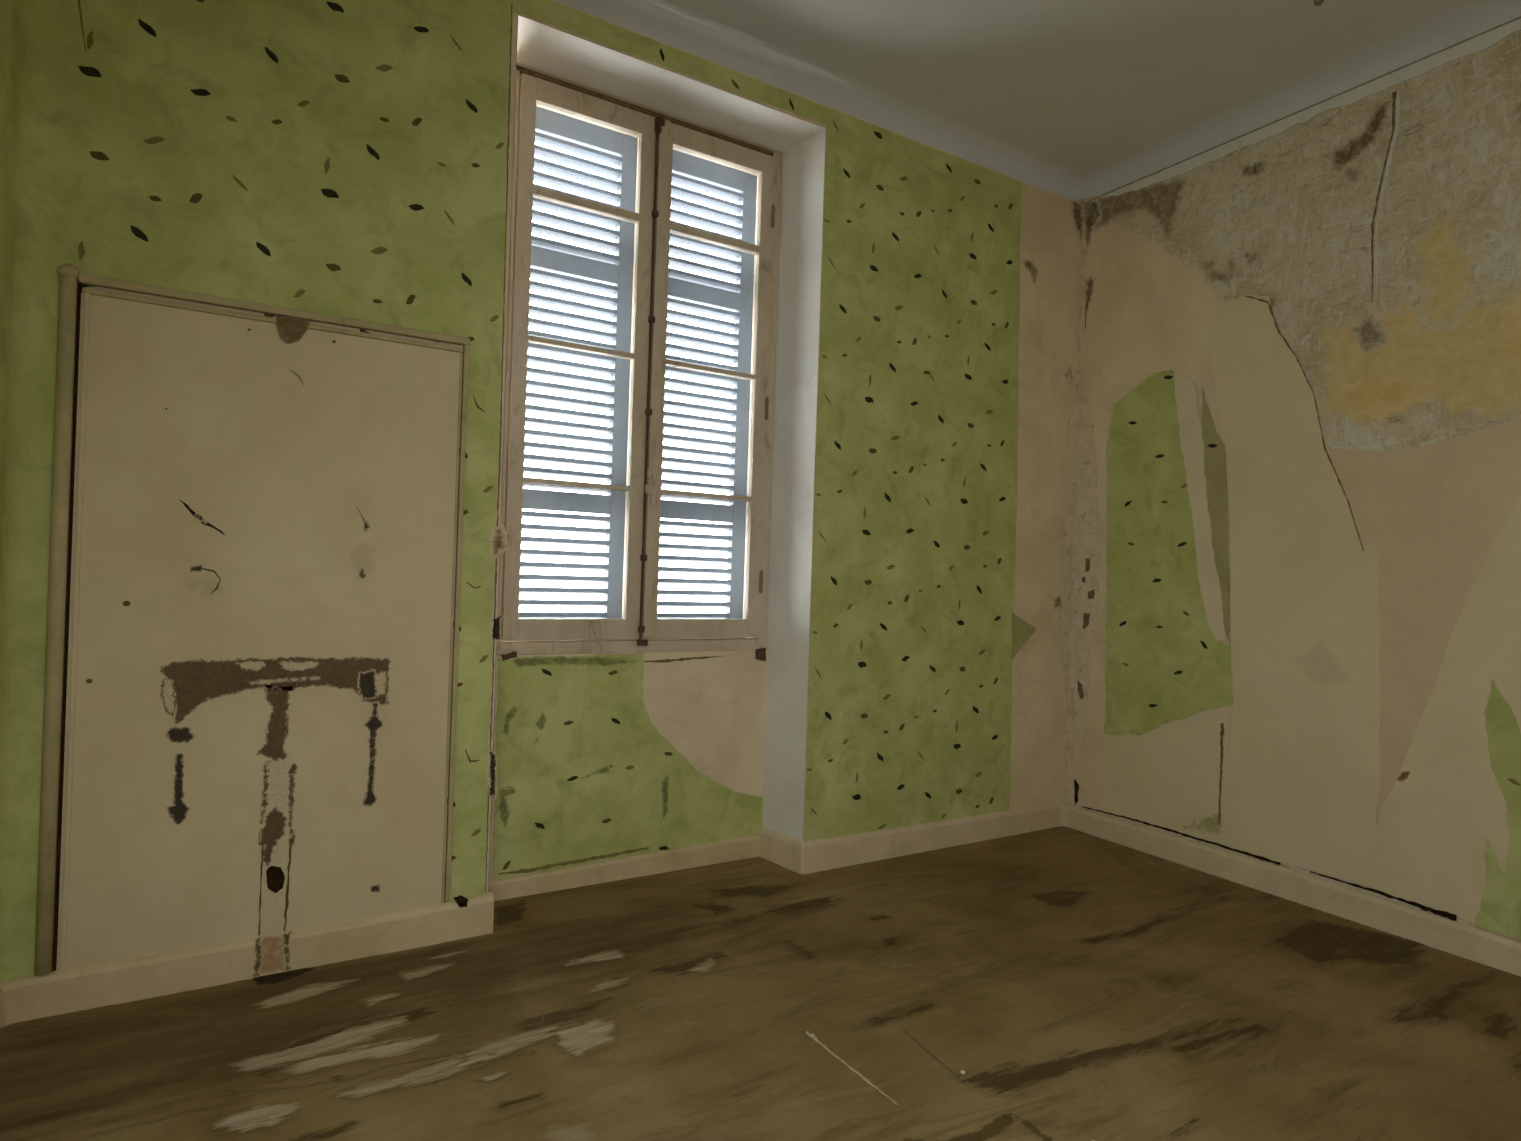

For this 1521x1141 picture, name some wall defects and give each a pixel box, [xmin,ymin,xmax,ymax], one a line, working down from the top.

leakage [1071,173,1190,250]
crack [1371,90,1400,299]
peeling [276,316,310,343]
crack [1245,295,1364,551]
flaking render [1071,222,1231,835]
spalling [357,668,376,701]